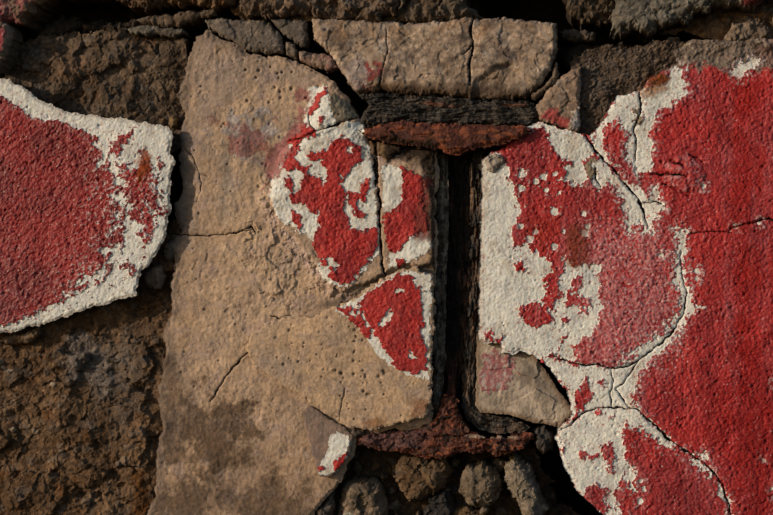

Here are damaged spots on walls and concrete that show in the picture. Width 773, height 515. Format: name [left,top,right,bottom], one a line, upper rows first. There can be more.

spalling [383,10,423,24]
crack [463,20,474,84]
spalling [0,30,193,515]
peeling [268,84,435,381]
crack [372,143,386,279]
peeling [478,0,773,515]
crack [633,92,642,161]
crack [586,136,703,226]
crack [210,352,248,402]
crack [551,217,773,514]
spalling [303,406,428,515]
spalling [447,440,584,515]